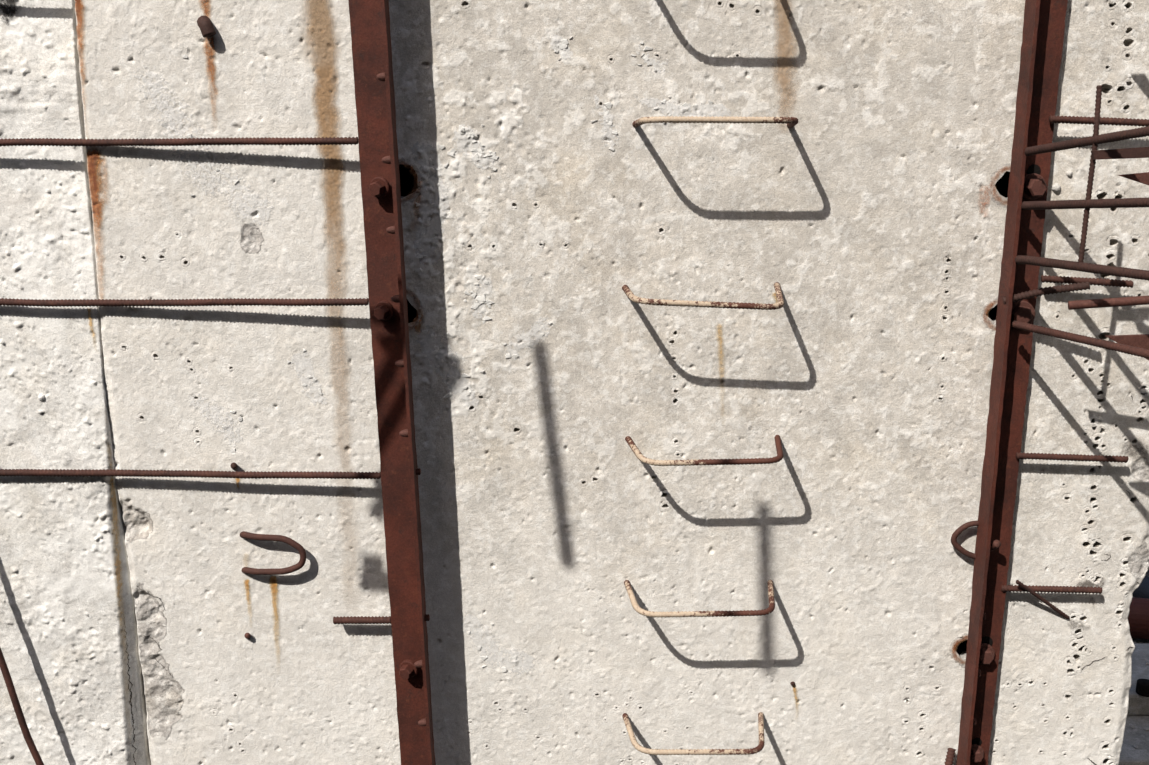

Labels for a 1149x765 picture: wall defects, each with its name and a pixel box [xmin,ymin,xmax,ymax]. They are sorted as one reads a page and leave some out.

corrosion [205,36,215,91]
peeling [0,66,359,226]
corrosion [87,149,105,250]
spalling [0,298,369,307]
spalling [0,469,381,479]
spalling [121,500,153,542]
corrosion [270,576,278,635]
spalling [333,616,391,625]
spalling [133,582,184,740]
spalling [0,647,44,765]